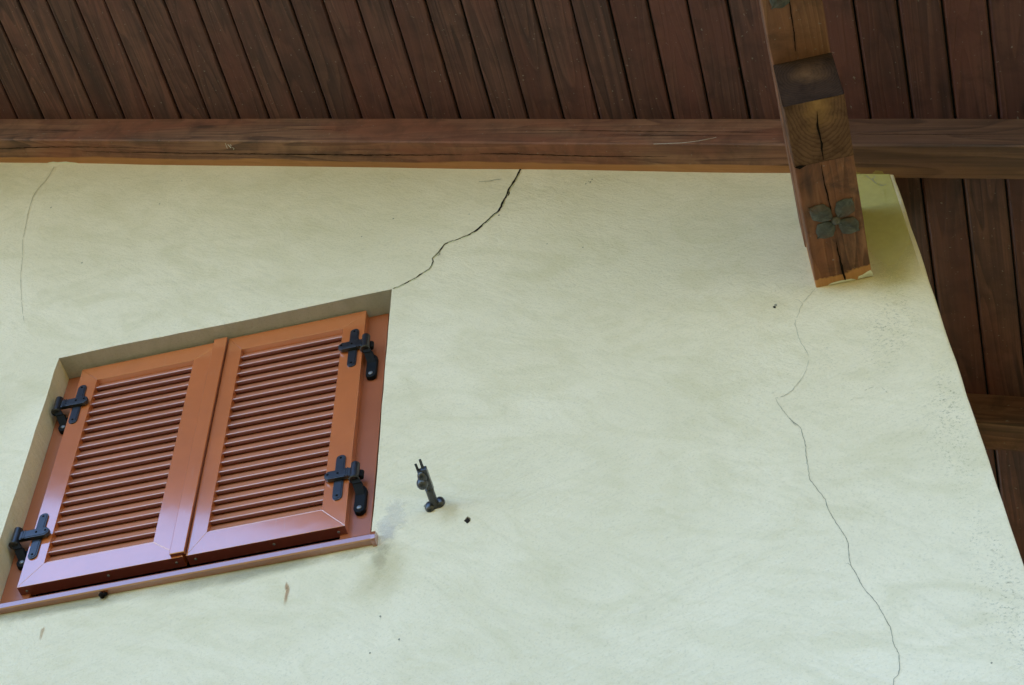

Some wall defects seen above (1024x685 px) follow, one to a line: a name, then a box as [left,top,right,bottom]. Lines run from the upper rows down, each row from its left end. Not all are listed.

crack [393,130,701,289]
crack [775,289,900,685]